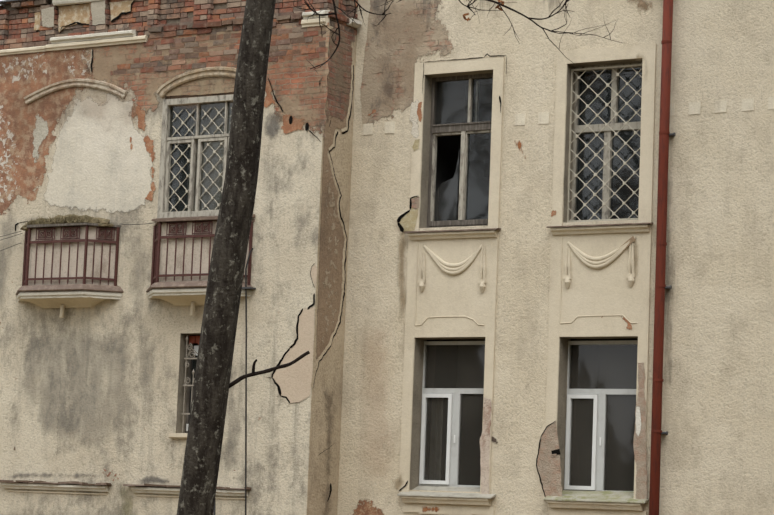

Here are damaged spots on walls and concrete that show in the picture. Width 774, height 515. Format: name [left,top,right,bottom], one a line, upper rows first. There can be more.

peeling [0,30,242,215]
crack [266,65,354,406]
flaking render [264,0,454,403]
spalling [537,421,562,497]
spalling [633,363,647,499]